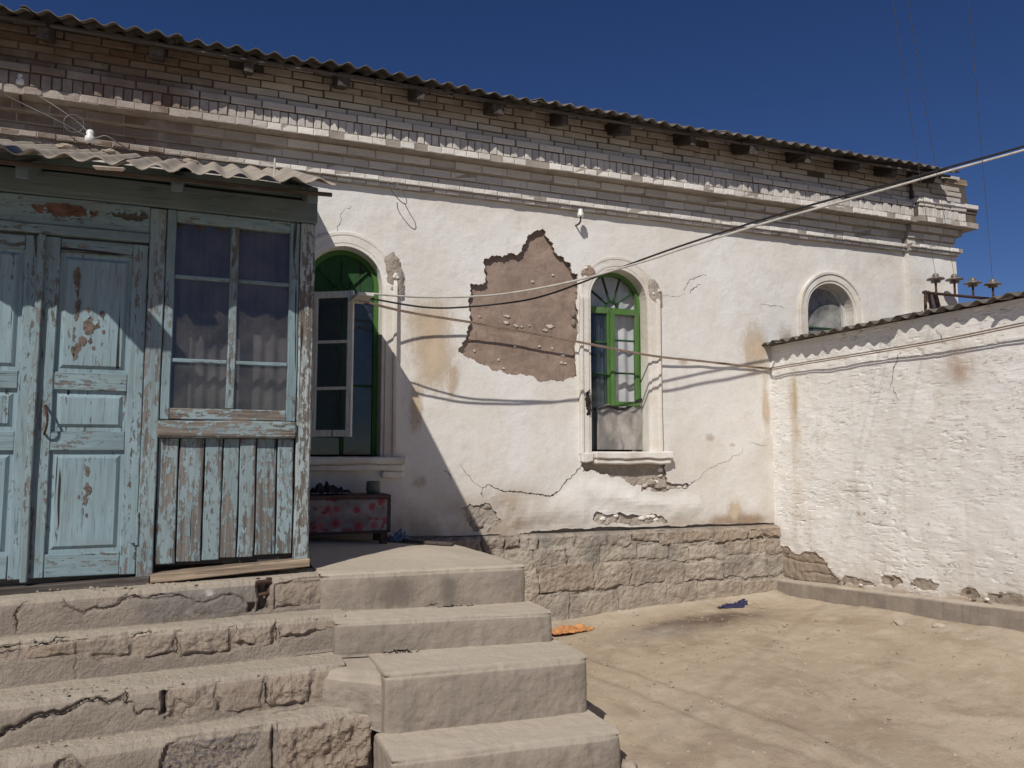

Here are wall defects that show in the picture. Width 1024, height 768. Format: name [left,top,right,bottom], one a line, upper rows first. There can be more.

flaking render [384,252,404,298]
peeling [71,267,105,360]
flaking render [458,230,596,382]
crack [445,464,581,497]
flaking render [581,462,687,492]
flaking render [461,503,501,532]
flaking render [593,511,667,528]
flaking render [781,544,939,591]
crack [63,590,187,614]
flaking render [960,586,1024,607]
crack [0,602,70,649]
crack [0,690,141,735]